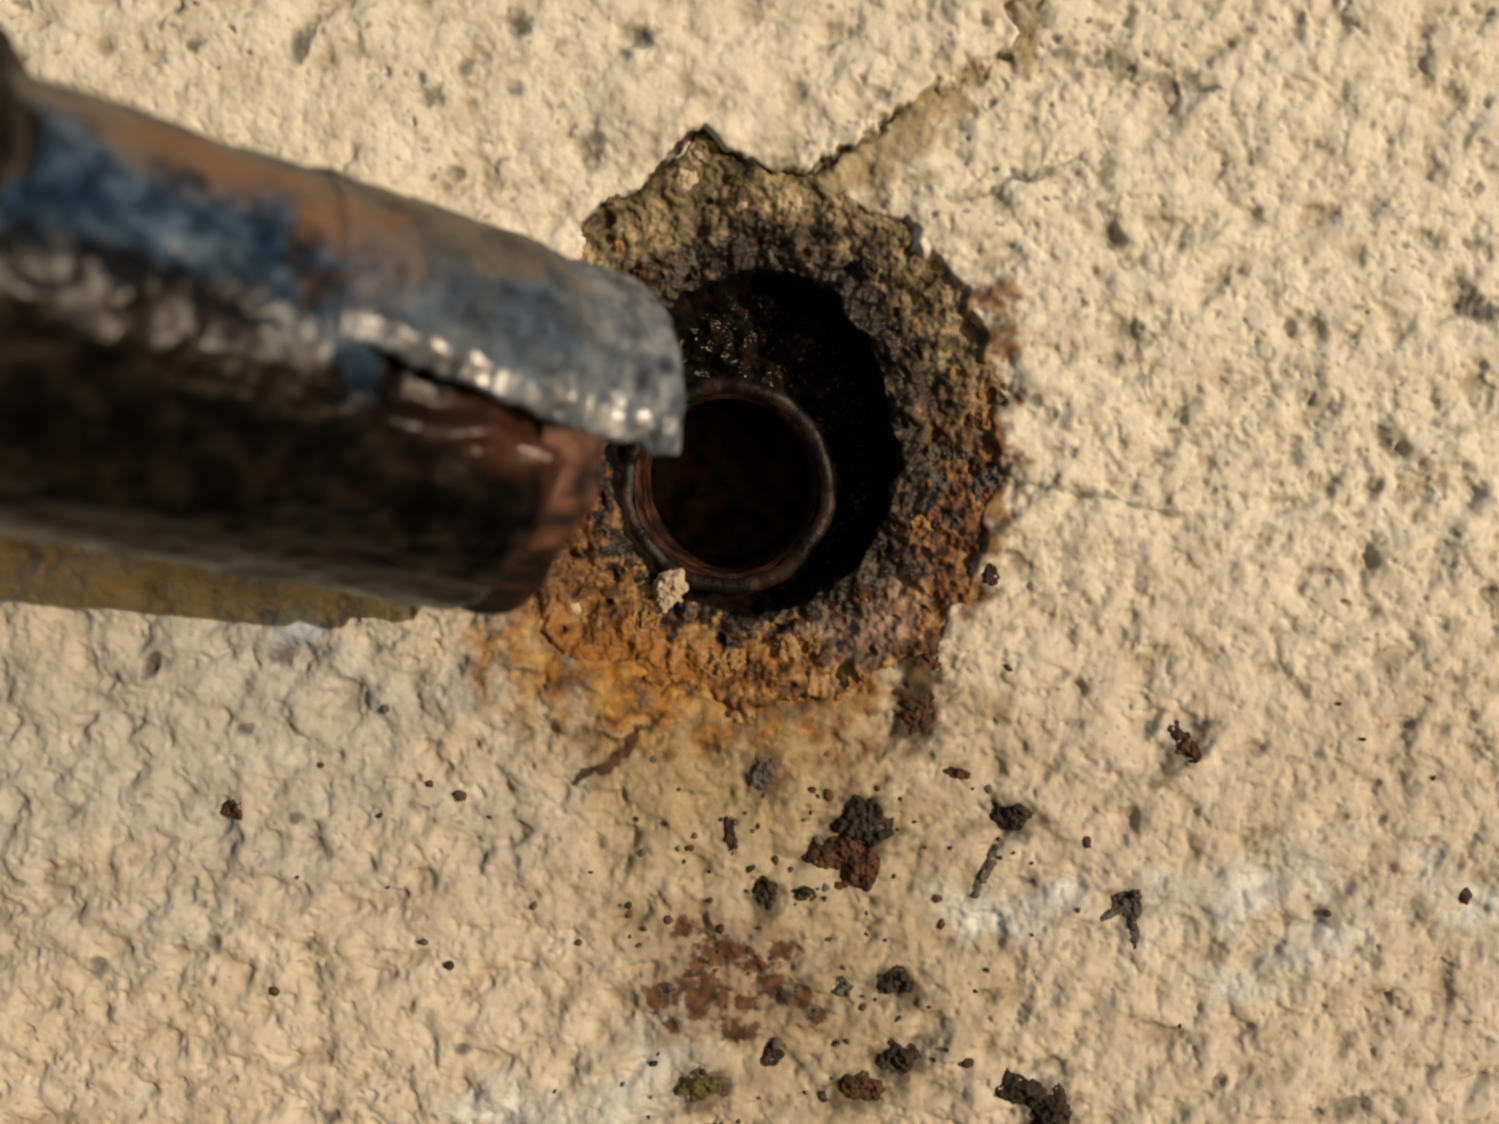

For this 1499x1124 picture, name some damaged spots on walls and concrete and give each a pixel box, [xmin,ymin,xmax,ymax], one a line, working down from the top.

flaking render [1011,2,1041,63]
crack [1055,50,1221,91]
flaking render [531,67,1008,726]
rust [460,419,944,892]
rust [751,875,818,918]